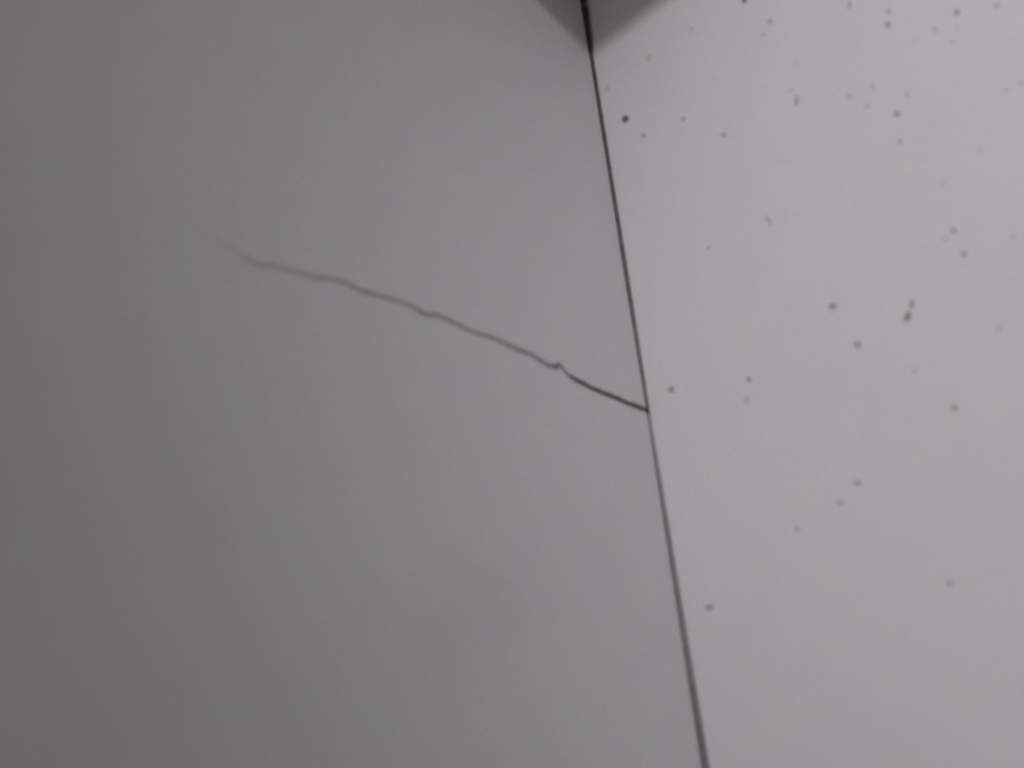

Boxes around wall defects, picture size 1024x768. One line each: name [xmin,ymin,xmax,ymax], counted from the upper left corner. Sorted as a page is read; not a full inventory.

crack [572,377,648,411]